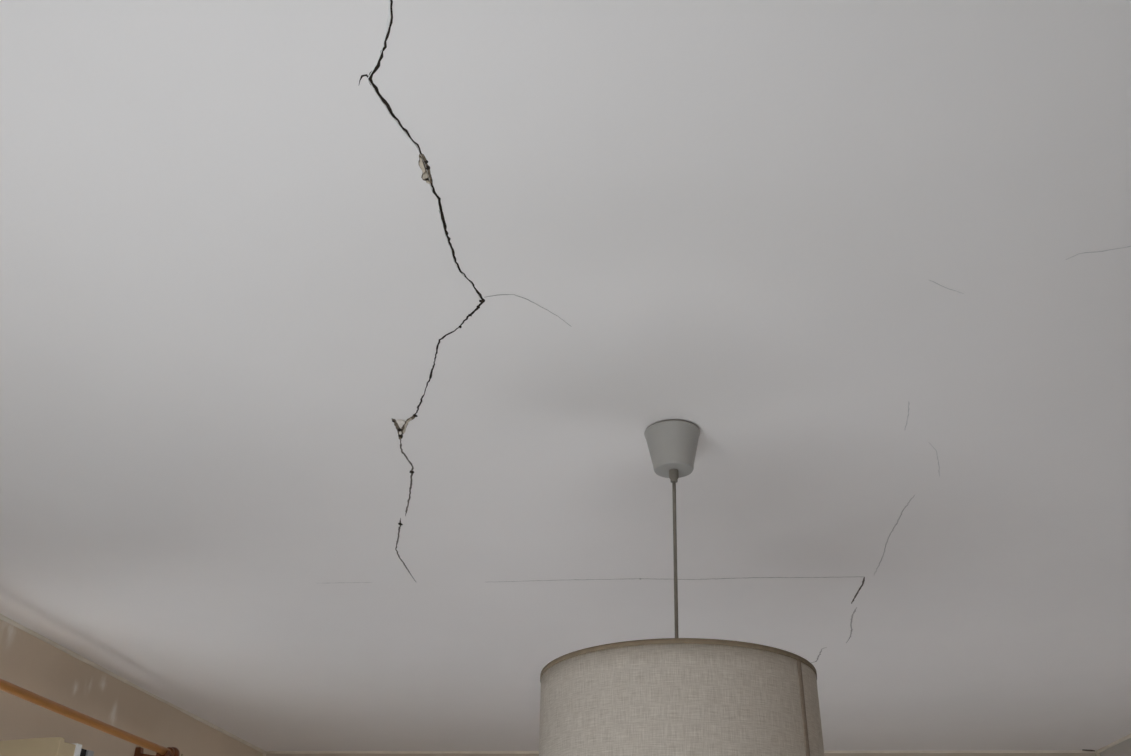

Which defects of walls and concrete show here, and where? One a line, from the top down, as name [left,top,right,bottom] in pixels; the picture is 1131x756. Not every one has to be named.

crack [359,0,569,582]
crack [677,574,828,582]
crack [811,496,914,663]